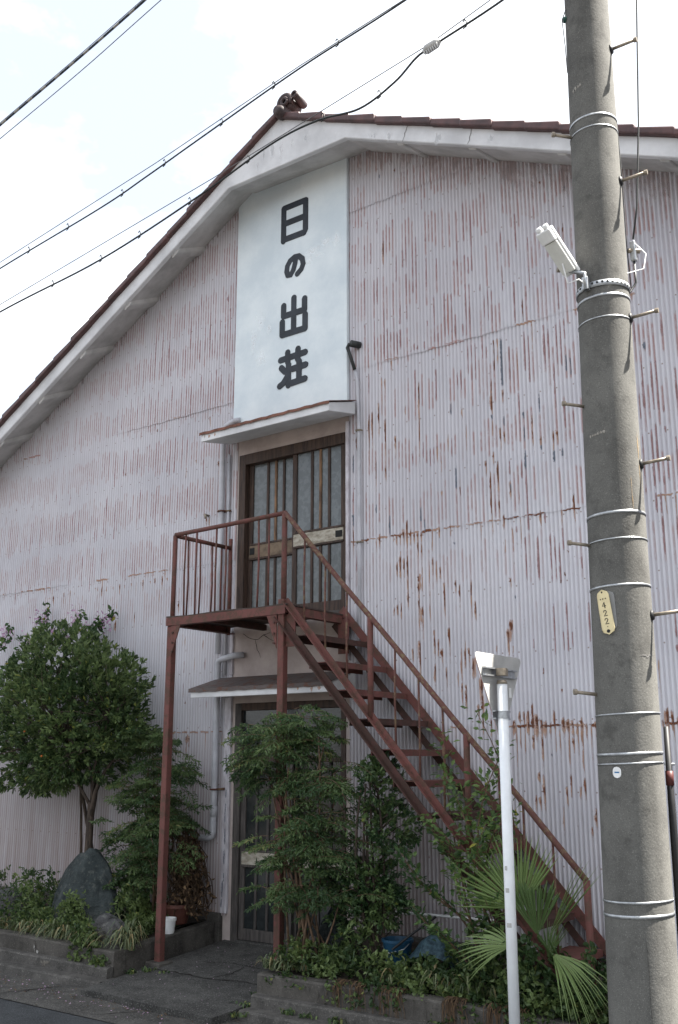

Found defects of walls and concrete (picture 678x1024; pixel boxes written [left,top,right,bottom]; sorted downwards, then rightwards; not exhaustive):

corrosion [95,569,168,607]
corrosion [351,378,545,734]
corrosion [509,705,596,827]
corrosion [662,708,678,736]